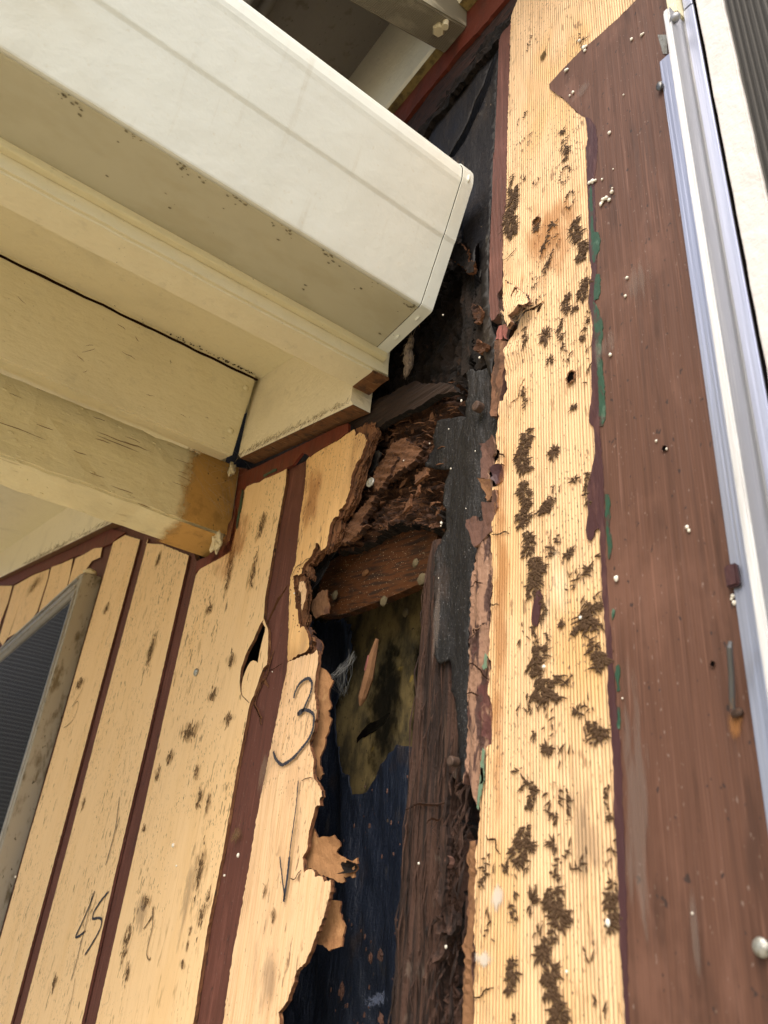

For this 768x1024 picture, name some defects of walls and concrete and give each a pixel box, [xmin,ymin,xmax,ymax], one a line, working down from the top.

spalling [449,51,498,157]
peeling [495,320,519,342]
spalling [226,413,324,470]
spalling [288,397,459,632]
peeling [465,435,504,549]
spalling [243,625,265,676]
damp [367,631,420,771]